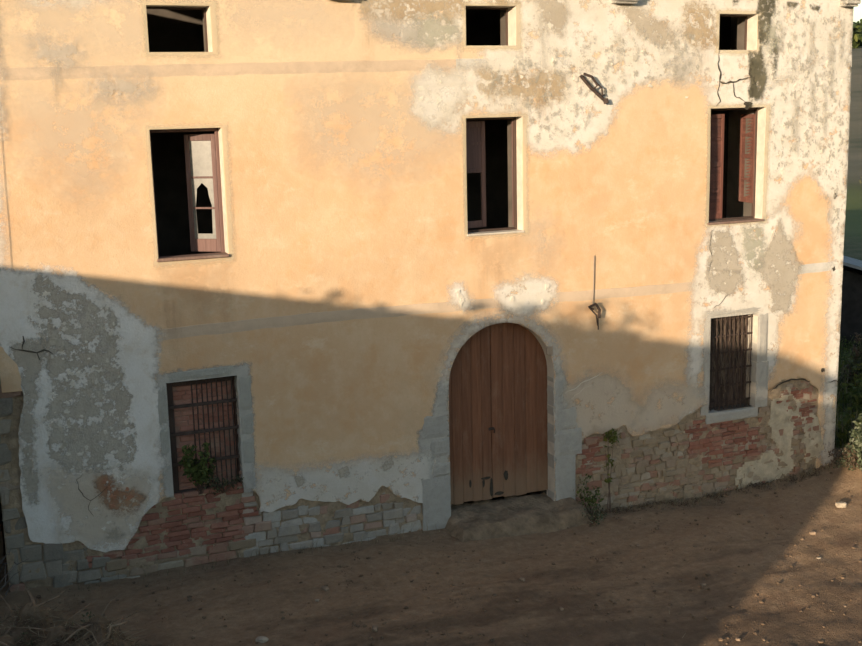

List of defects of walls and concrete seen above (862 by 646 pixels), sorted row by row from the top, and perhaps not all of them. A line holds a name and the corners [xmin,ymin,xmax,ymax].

crack [717,51,750,105]
peeling [361,0,853,512]
crack [10,336,53,360]
spalling [0,225,434,592]
corrosion [95,474,145,512]